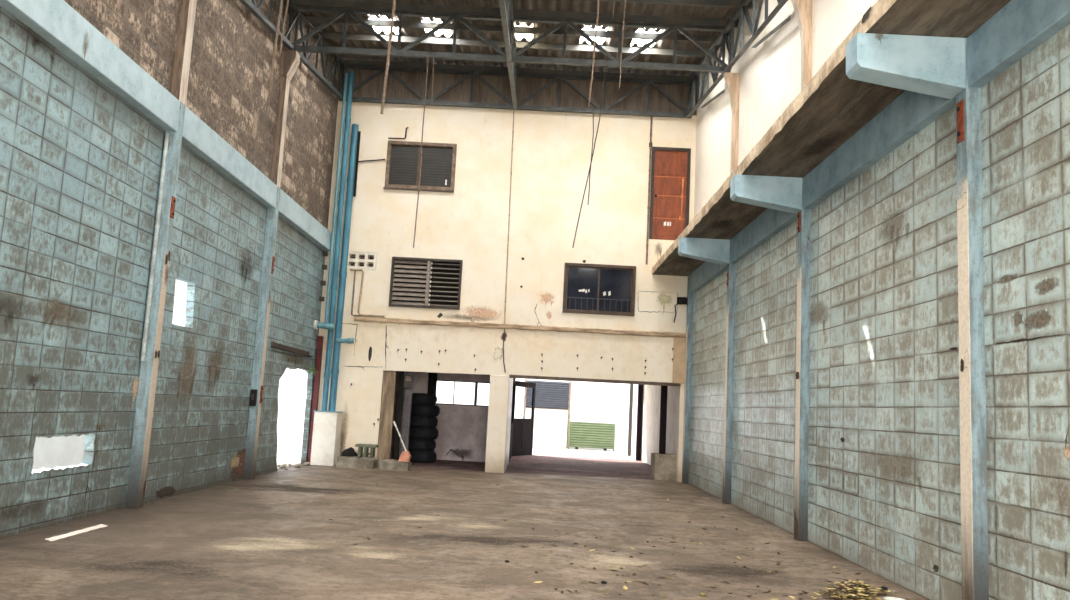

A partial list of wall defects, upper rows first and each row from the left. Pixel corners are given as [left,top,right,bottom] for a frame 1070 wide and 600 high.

leakage [242,254,252,279]
leakage [178,348,195,402]